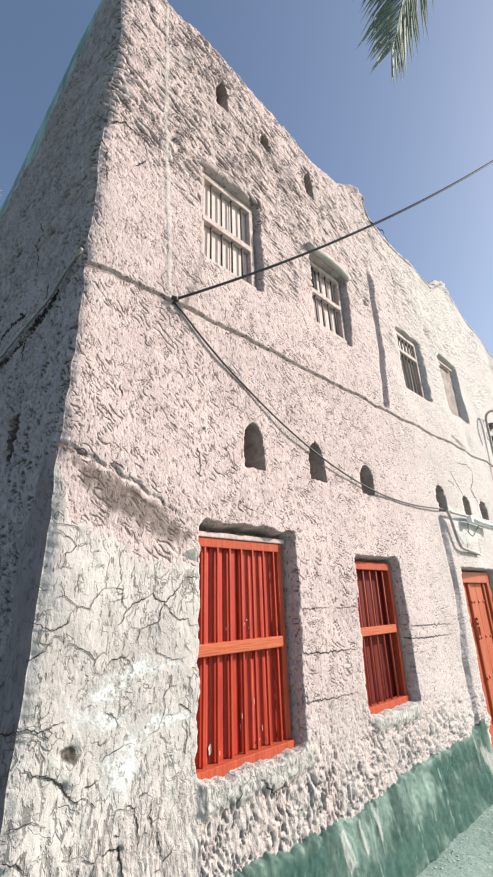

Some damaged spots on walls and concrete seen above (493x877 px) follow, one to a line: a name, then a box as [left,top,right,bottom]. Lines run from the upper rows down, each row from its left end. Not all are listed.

crack [0,223,59,367]
crack [0,518,198,877]
crack [403,623,455,639]